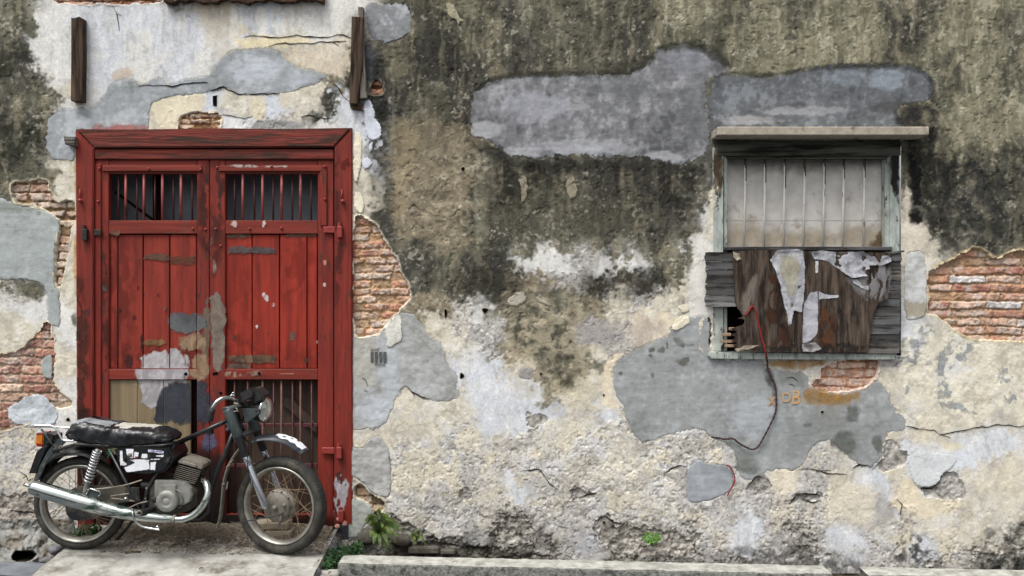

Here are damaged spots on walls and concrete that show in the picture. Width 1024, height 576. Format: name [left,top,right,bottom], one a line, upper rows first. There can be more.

crack [245,34,351,46]
crack [139,82,279,119]
damp [368,96,387,120]
damp [895,70,1023,235]
damp [515,159,703,205]
spalling [9,180,76,287]
spalling [341,81,410,348]
spalling [926,248,1024,344]
damp [649,338,689,365]
spalling [0,320,83,433]
spalling [812,360,880,392]
crack [906,424,1021,437]